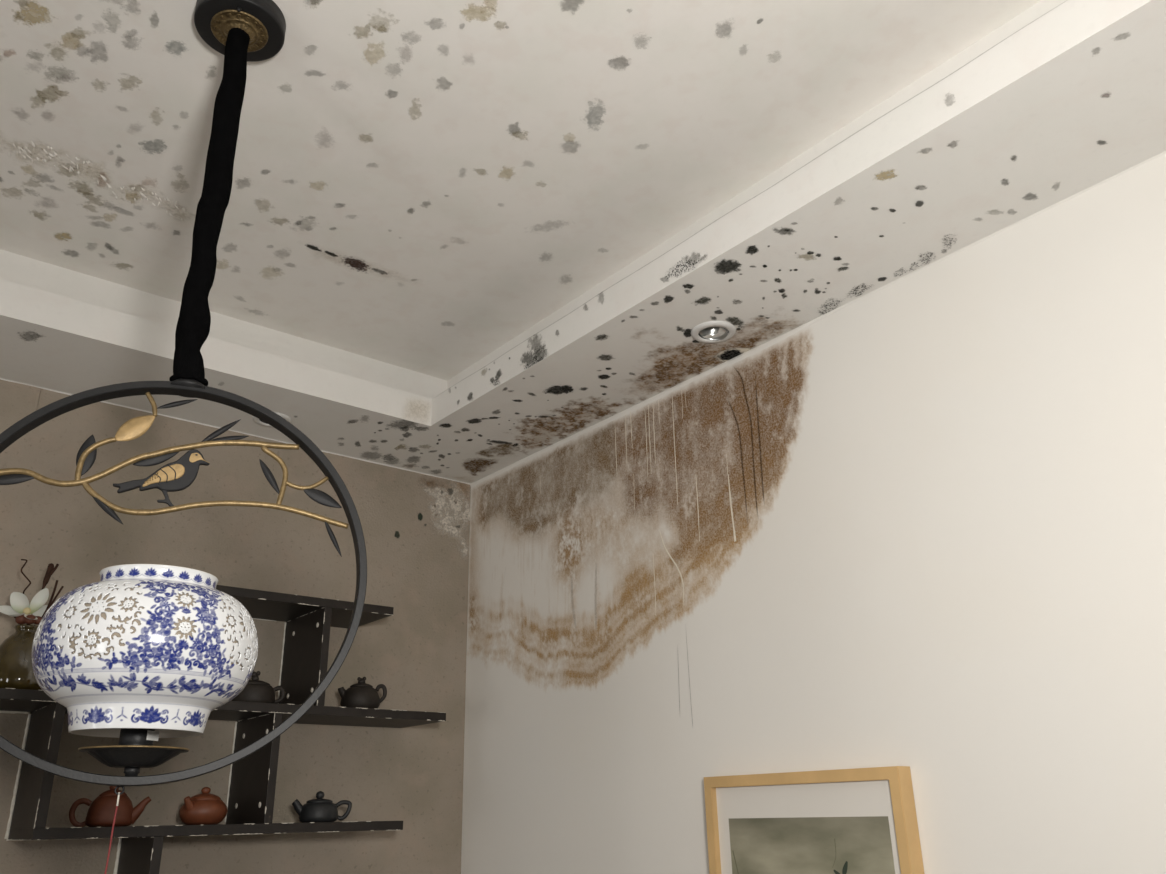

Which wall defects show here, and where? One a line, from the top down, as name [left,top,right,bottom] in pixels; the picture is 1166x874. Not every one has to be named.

water stain [355,245,837,695]
water stain [850,253,931,296]